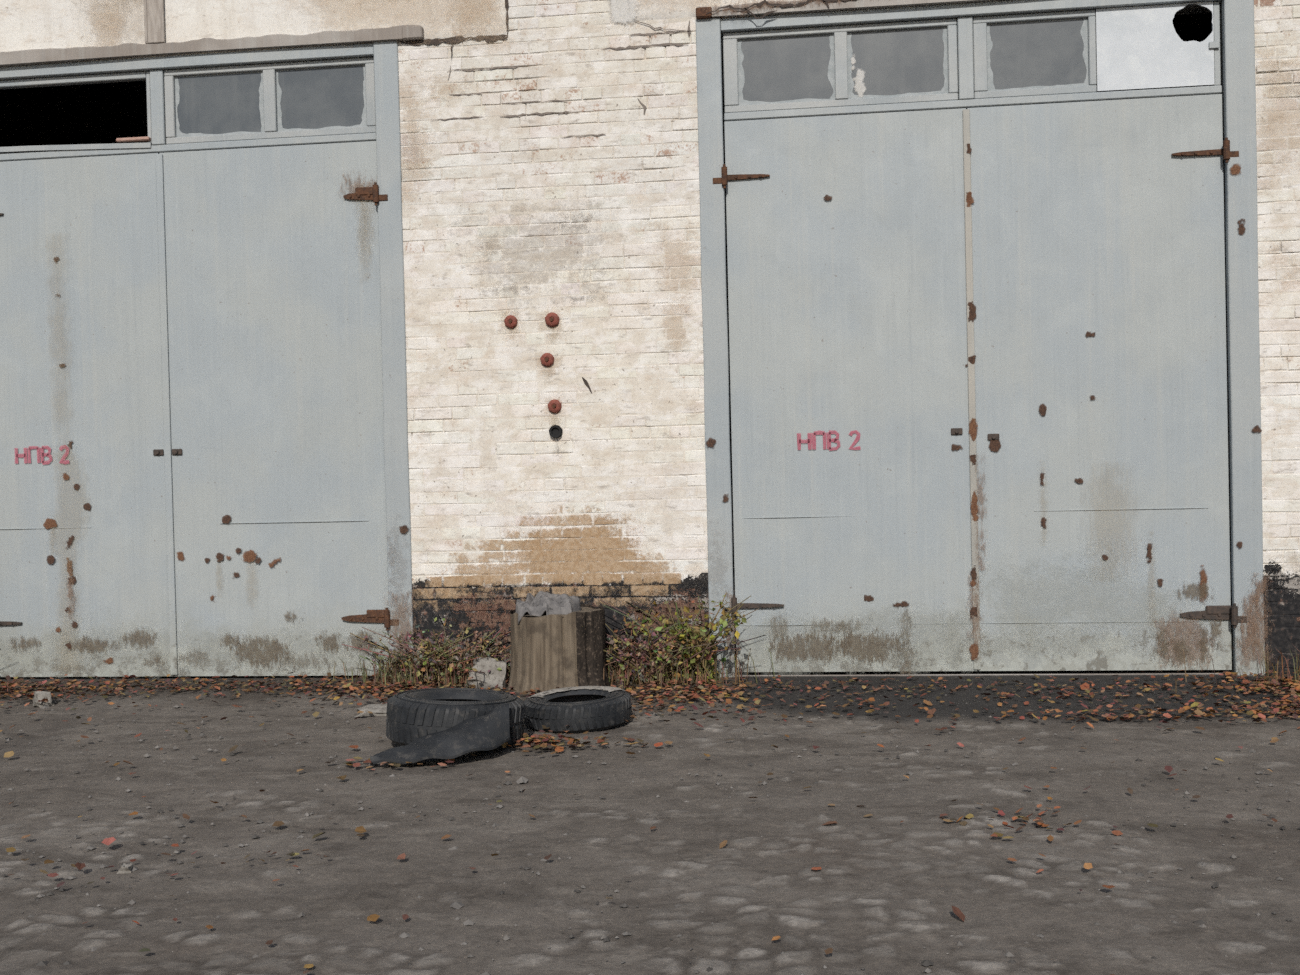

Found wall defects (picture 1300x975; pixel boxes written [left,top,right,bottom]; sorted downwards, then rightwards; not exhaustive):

crack [399,0,606,138]
rust [968,301,976,322]
rust [63,473,91,511]
rust [43,518,57,530]
rust [47,535,77,649]
rust [204,548,281,577]
rust [951,418,1001,660]
rust [1157,565,1213,602]
rust [1156,618,1222,668]
rust [1237,578,1270,665]